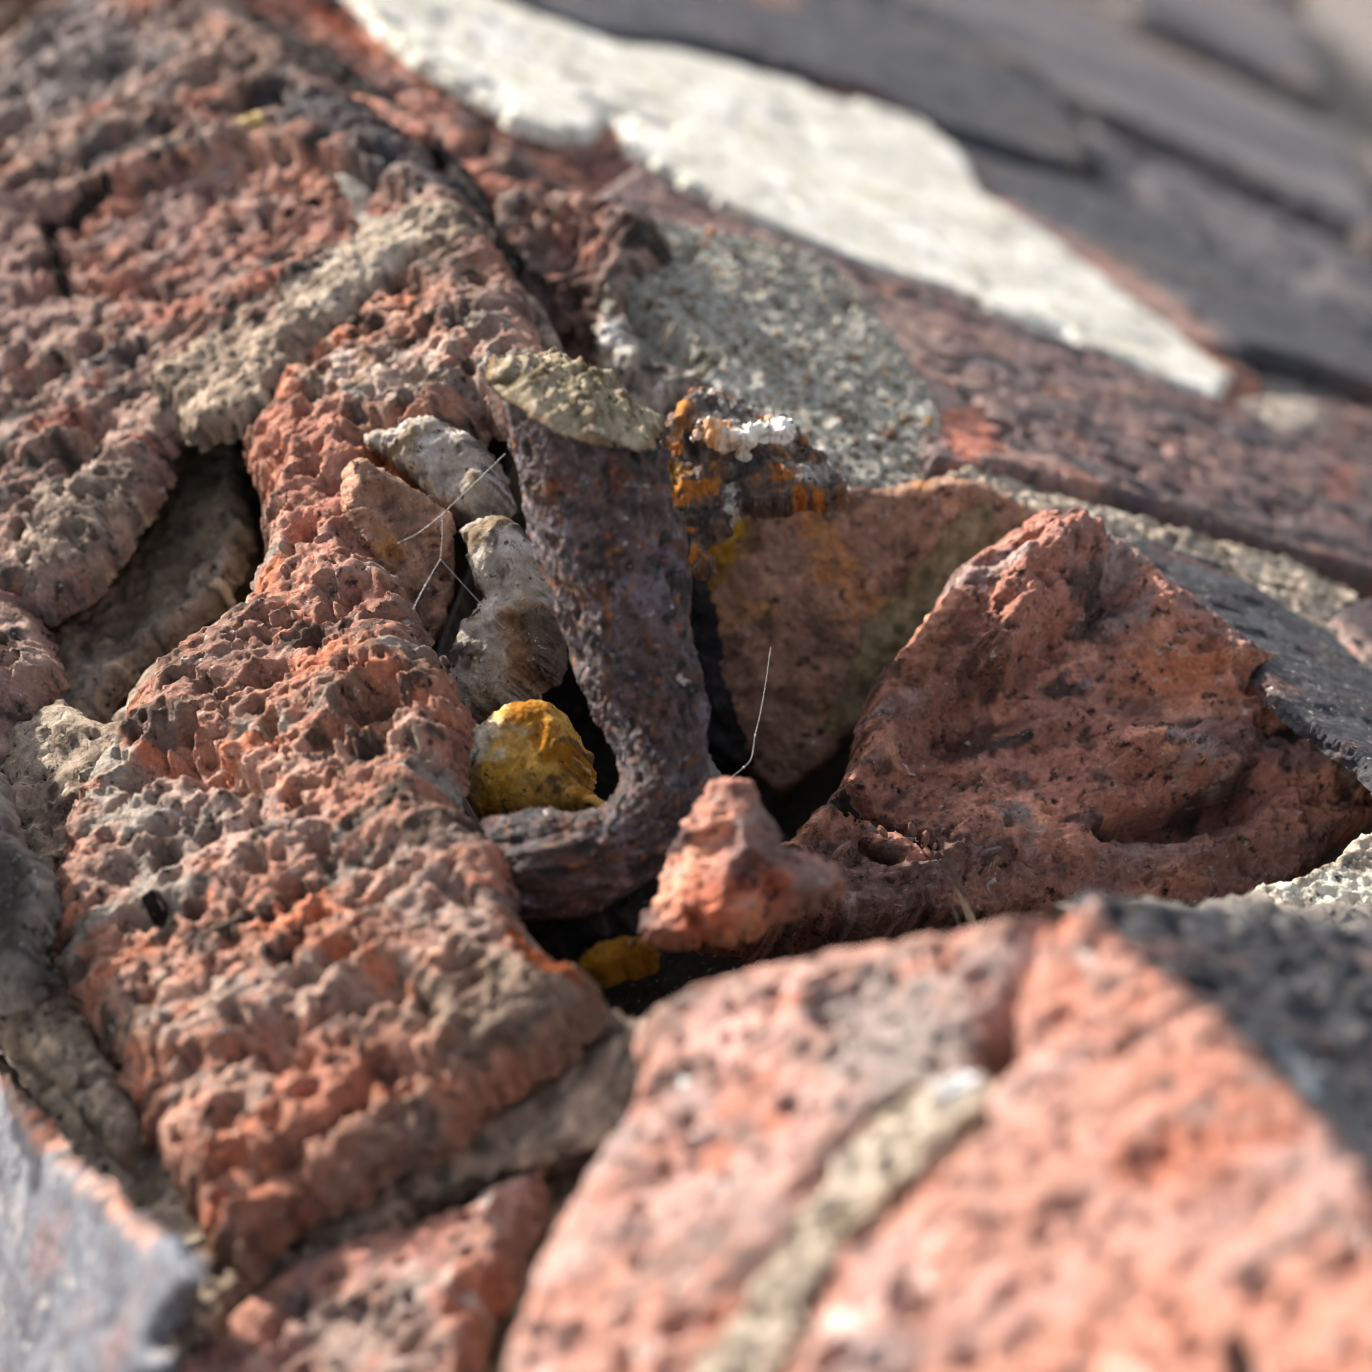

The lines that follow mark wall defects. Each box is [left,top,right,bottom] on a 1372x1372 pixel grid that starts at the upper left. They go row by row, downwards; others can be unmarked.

corrosion [660,385,850,770]